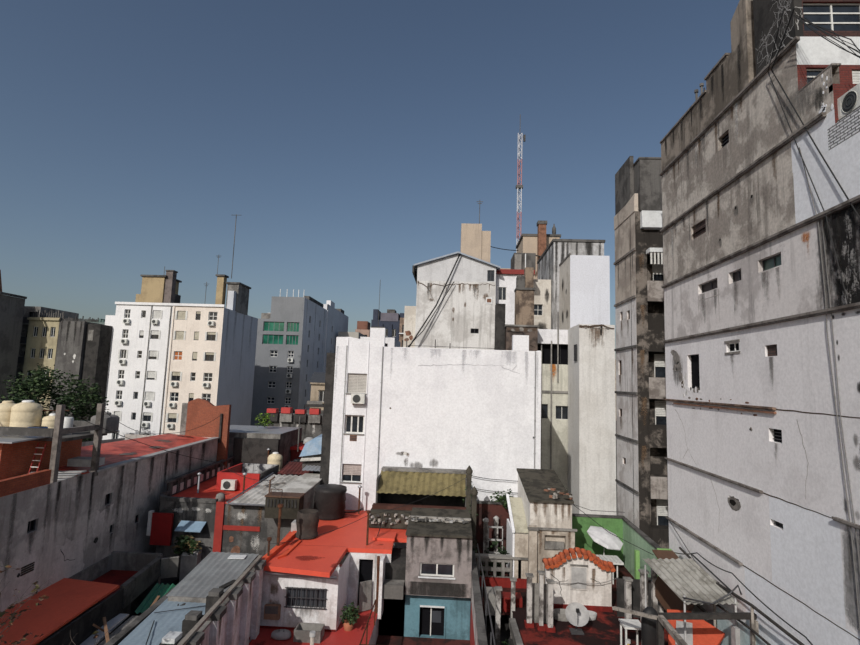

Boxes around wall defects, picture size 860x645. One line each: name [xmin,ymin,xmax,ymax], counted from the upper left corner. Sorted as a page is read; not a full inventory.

water stain [781,87,823,121]
water stain [817,202,860,319]
crack [418,281,495,298]
crack [418,364,520,374]
water stain [843,525,860,630]